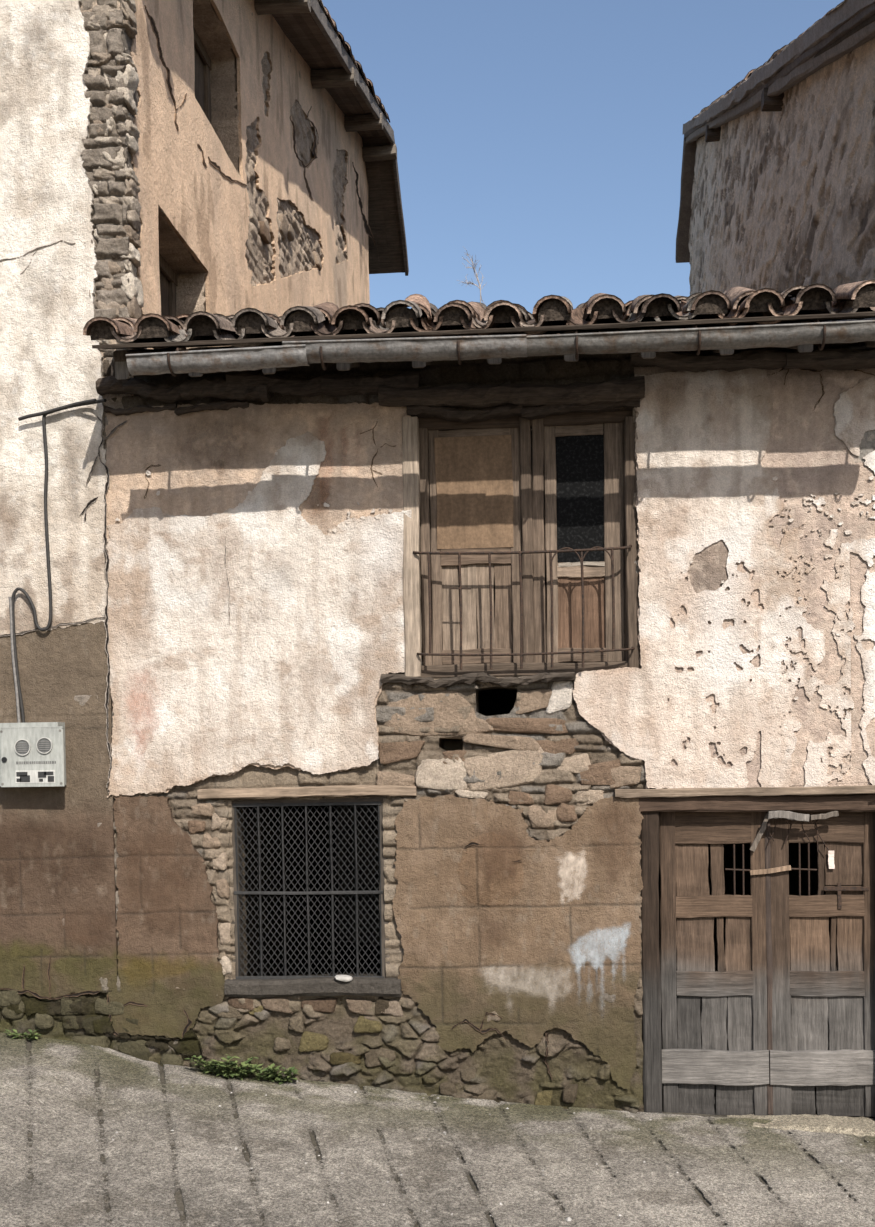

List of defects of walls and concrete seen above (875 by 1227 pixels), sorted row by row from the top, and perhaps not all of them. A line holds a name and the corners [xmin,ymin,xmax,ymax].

crack [144,5,247,186]
spalling [245,52,347,286]
crack [0,240,85,274]
flaking render [106,407,403,551]
flaking render [681,540,734,593]
flaking render [761,371,875,786]
spalling [376,681,646,841]
spalling [174,795,234,980]
leakage [572,929,628,967]
spalling [0,989,641,1114]